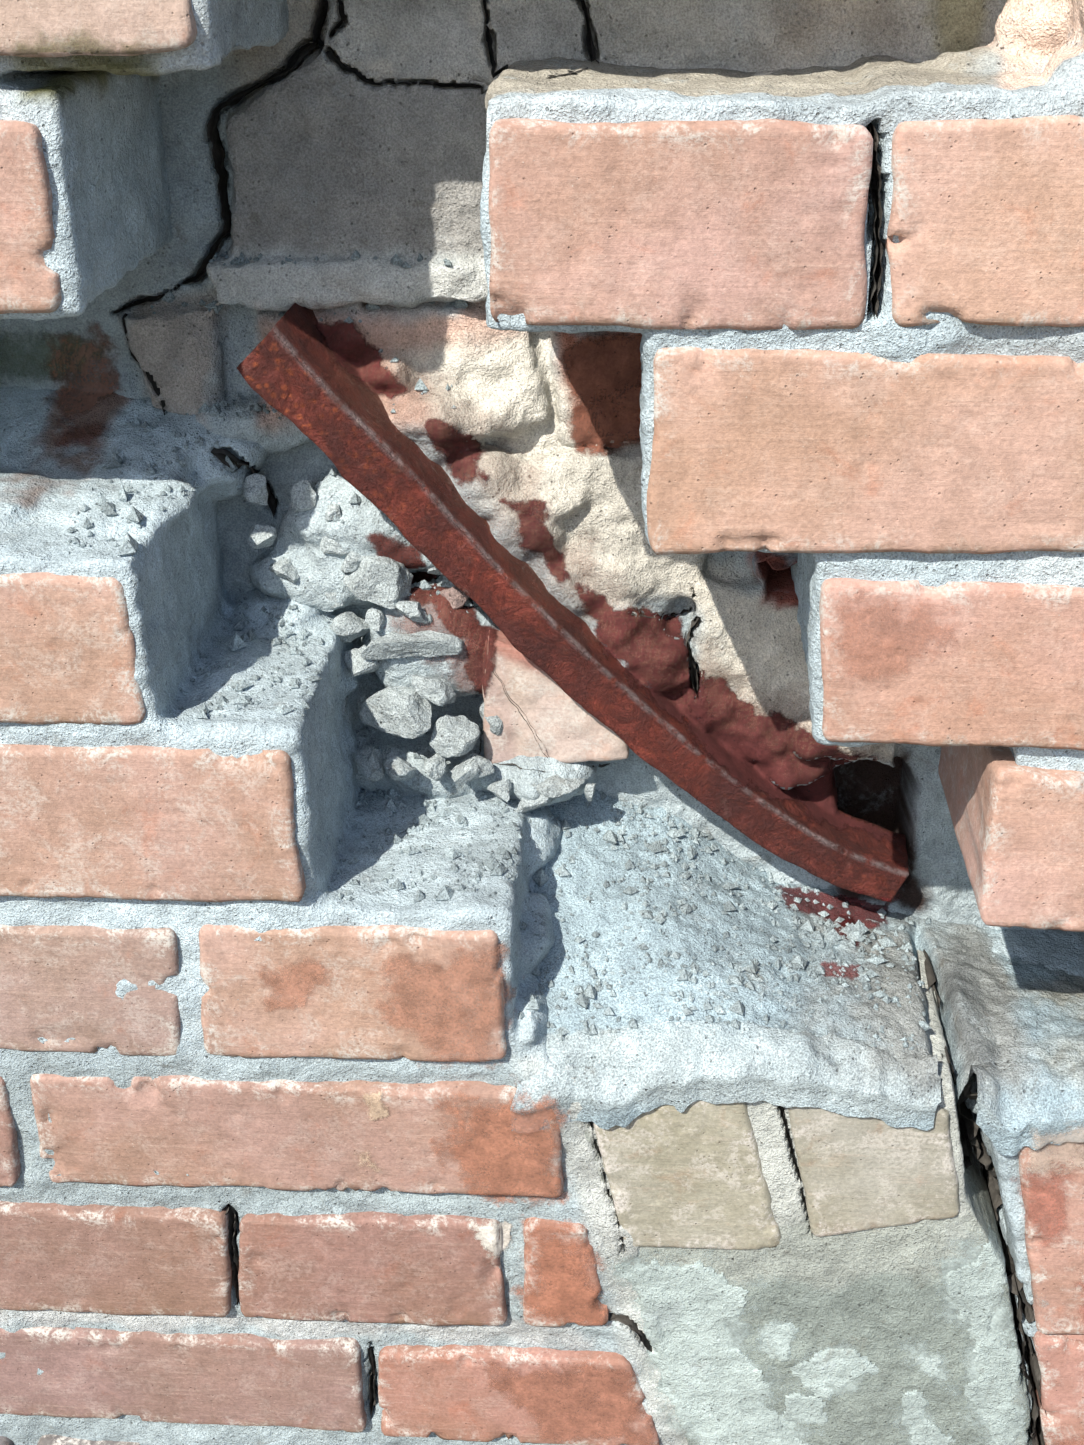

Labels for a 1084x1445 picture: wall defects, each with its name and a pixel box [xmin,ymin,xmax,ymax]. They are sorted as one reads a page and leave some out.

crack [113,0,508,416]
crack [868,122,883,319]
corrosion [315,320,408,398]
corrosion [424,418,489,484]
spalling [559,334,642,455]
corrosion [367,532,498,698]
spalling [482,630,629,764]
corrosion [499,498,894,842]
spalling [260,962,325,1010]
spalling [379,945,514,1063]
crack [225,1205,240,1306]
crack [923,950,1047,1445]